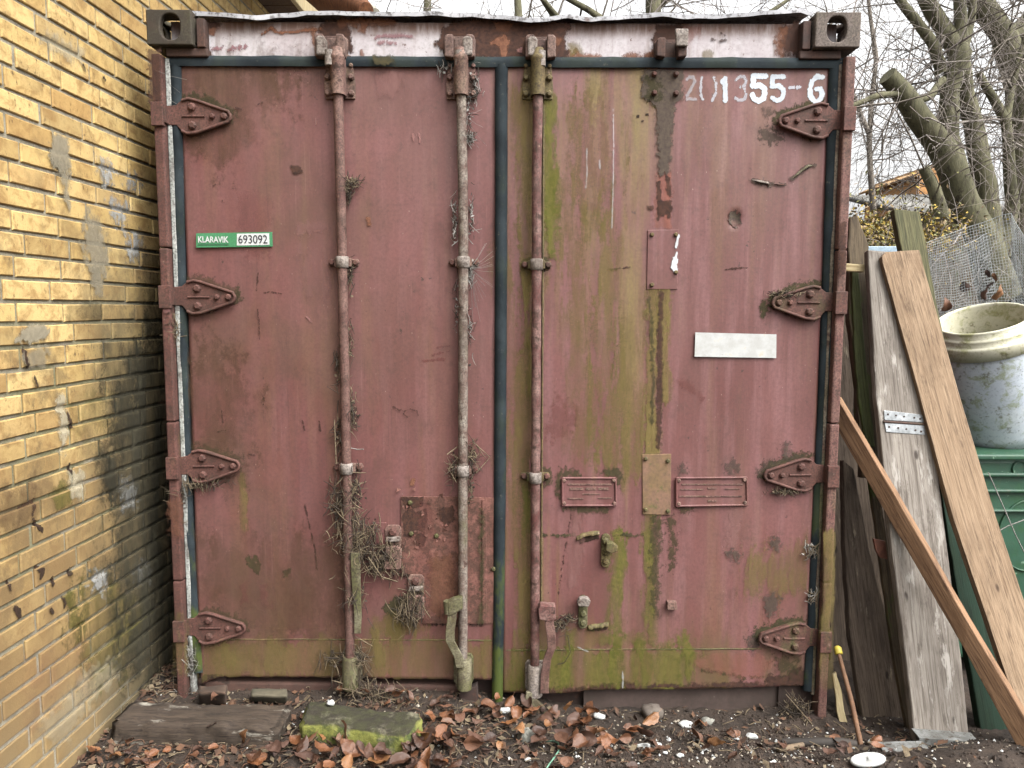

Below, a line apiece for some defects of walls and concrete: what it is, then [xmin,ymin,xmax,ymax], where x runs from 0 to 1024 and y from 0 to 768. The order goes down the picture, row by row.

peeling [434,17,571,57]
leakage [69,468,85,500]